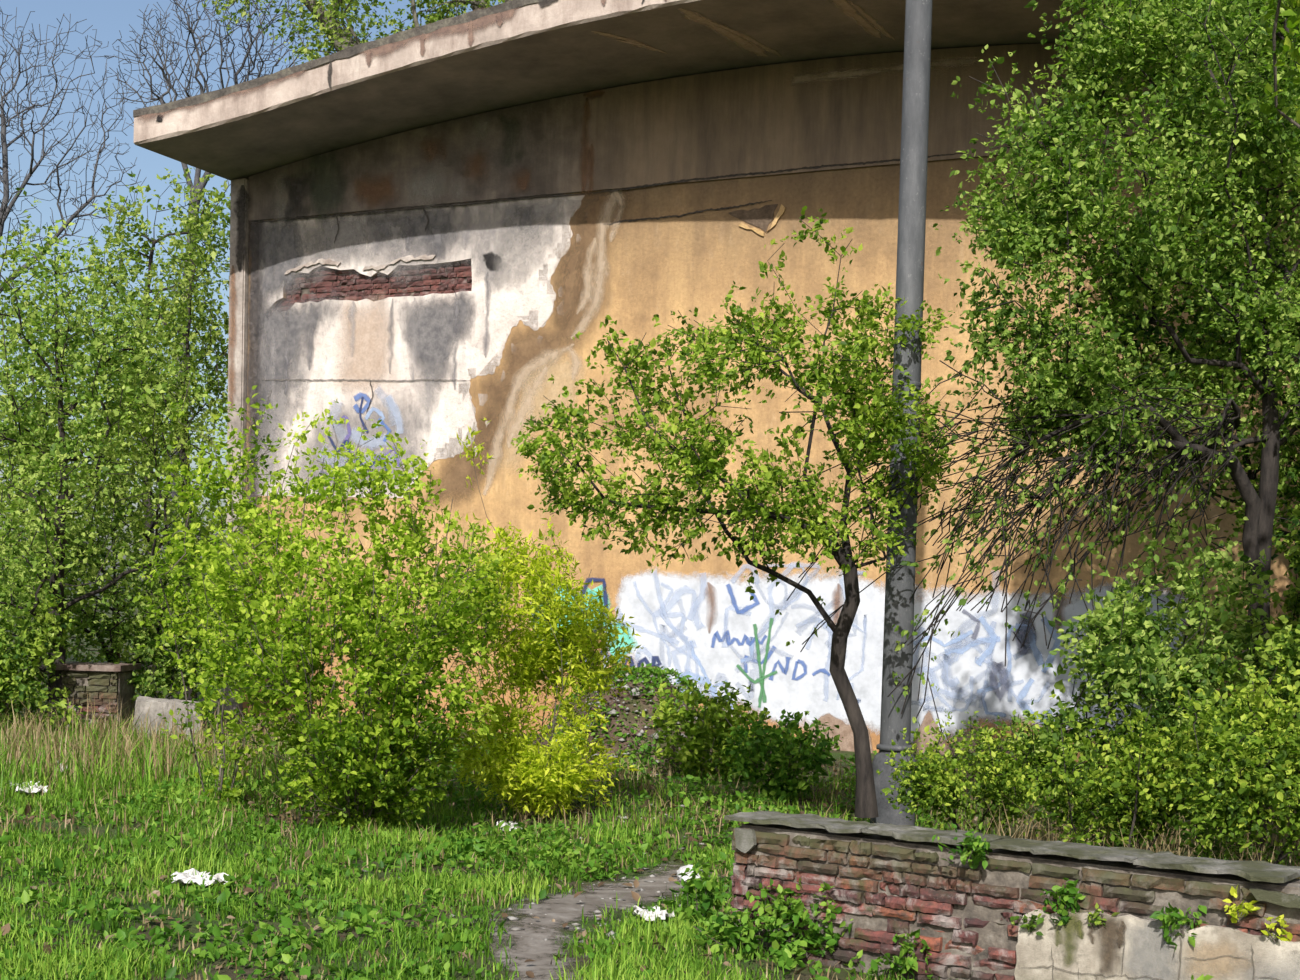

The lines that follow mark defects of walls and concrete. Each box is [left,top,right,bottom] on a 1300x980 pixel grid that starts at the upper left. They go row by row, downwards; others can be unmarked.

damp [257,176,561,489]
peeling [256,195,585,498]
damp [435,189,622,499]
spalling [729,204,786,236]